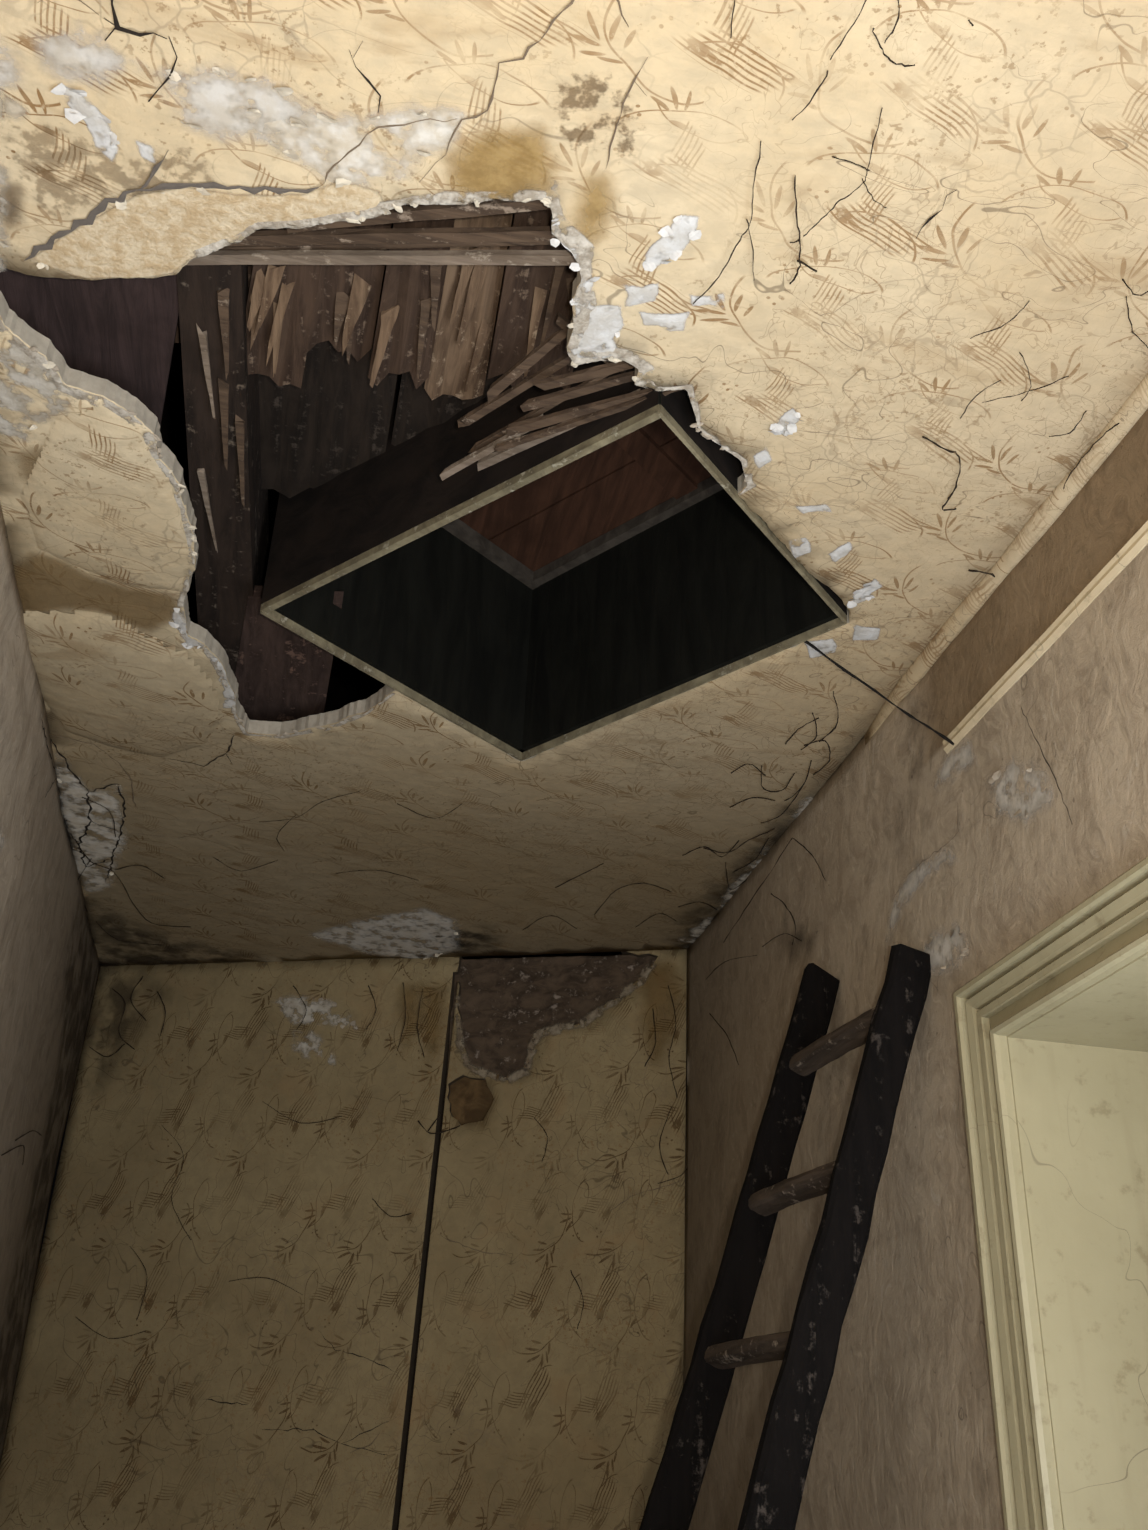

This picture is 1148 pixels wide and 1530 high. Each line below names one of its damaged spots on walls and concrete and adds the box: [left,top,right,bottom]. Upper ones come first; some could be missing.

peeling [42,36,155,162]
crack [24,0,574,261]
damp [454,133,547,196]
damp [582,182,608,234]
crack [606,0,648,168]
crack [916,190,956,238]
peeling [32,67,771,495]
peeling [768,409,802,436]
peeling [0,319,395,738]
peeling [805,579,881,658]
peeling [57,768,126,891]
spalling [313,909,657,1126]